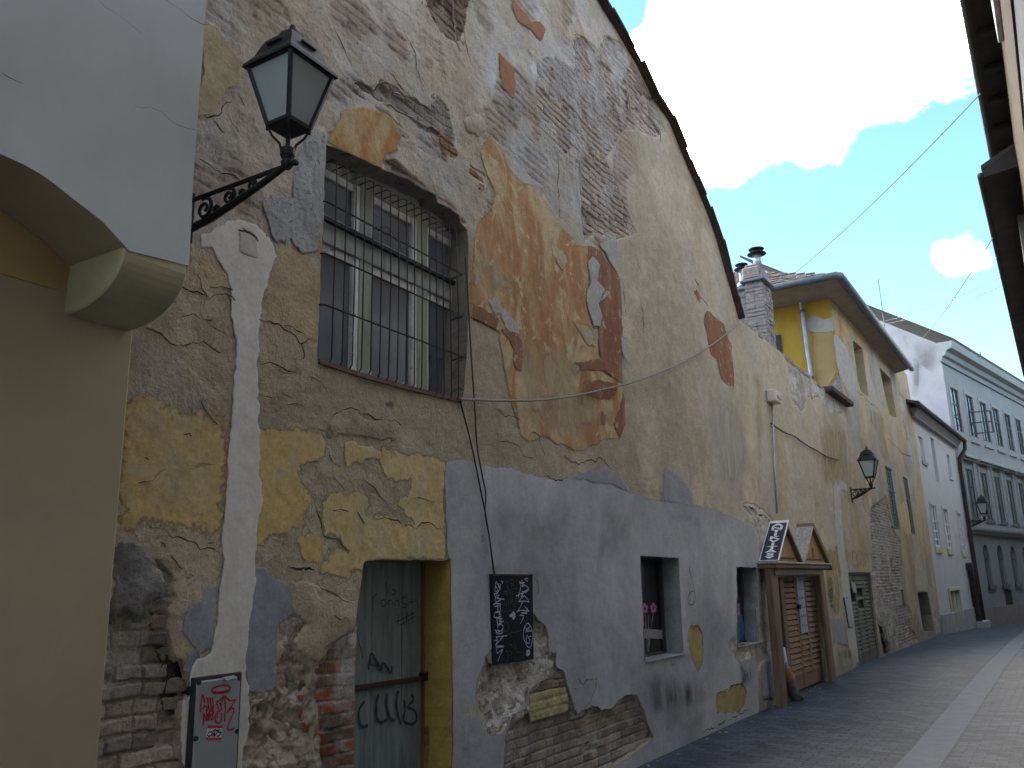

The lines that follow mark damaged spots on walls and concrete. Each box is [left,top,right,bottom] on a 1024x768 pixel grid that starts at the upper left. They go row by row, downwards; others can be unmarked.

crack [146,274,235,353]
spalling [263,82,458,254]
flaking render [469,35,664,451]
peeling [694,289,734,388]
peeling [117,393,229,535]
crack [149,527,217,569]
crack [259,318,441,551]
peeling [257,427,446,580]
crack [497,403,613,481]
flaking render [97,570,200,768]
flaking render [242,616,358,768]
flaking render [476,616,651,768]